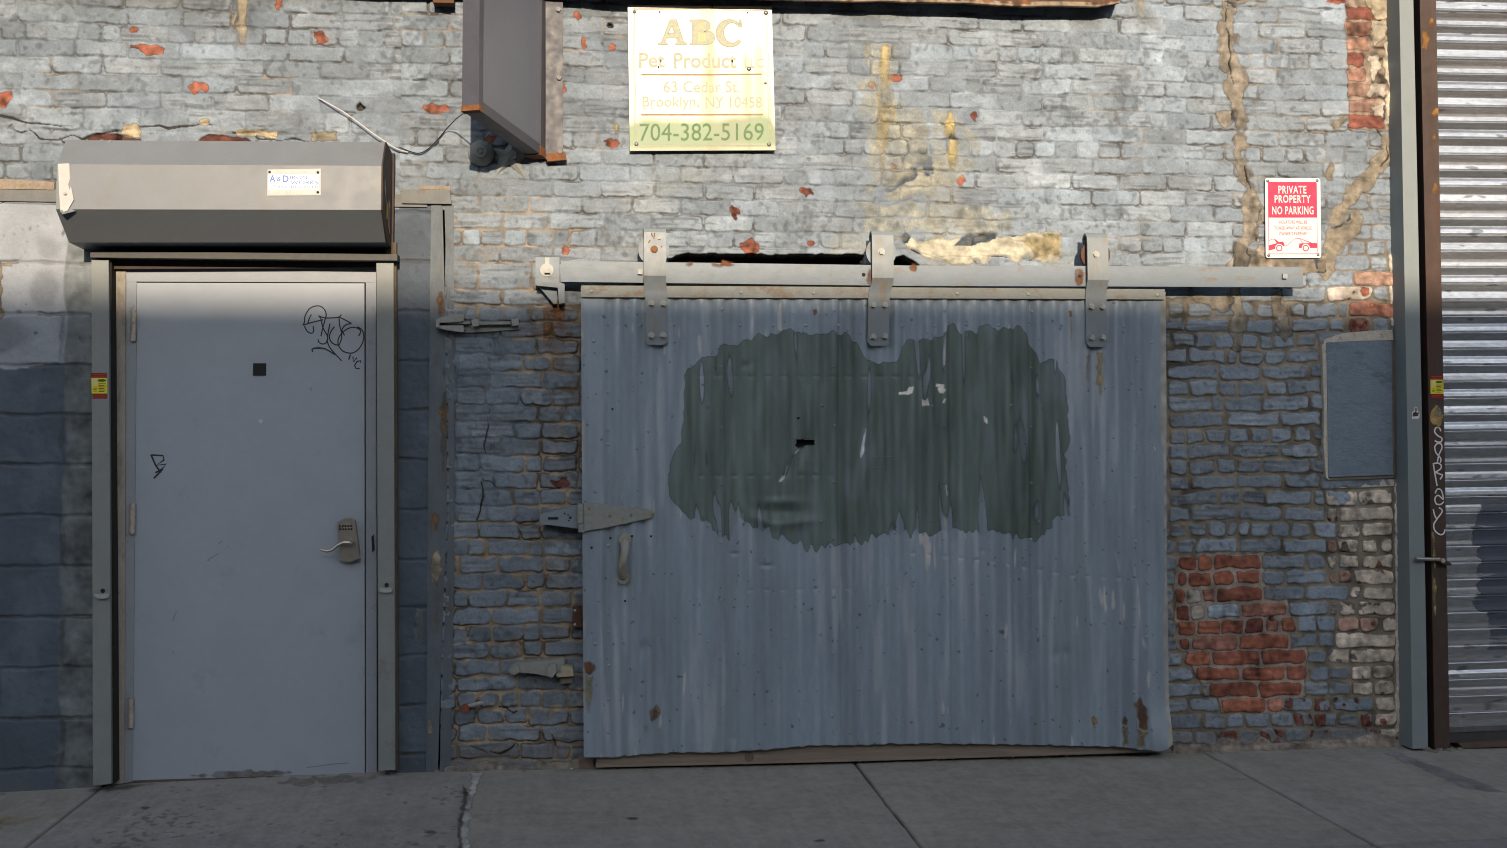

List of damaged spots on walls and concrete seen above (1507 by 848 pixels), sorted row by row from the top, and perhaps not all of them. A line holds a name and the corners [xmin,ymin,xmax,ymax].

water stain [860,45,1062,265]
crack [1215,0,1266,267]
spalling [1326,0,1390,132]
rust [1123,699,1148,746]
peeling [1172,483,1400,742]